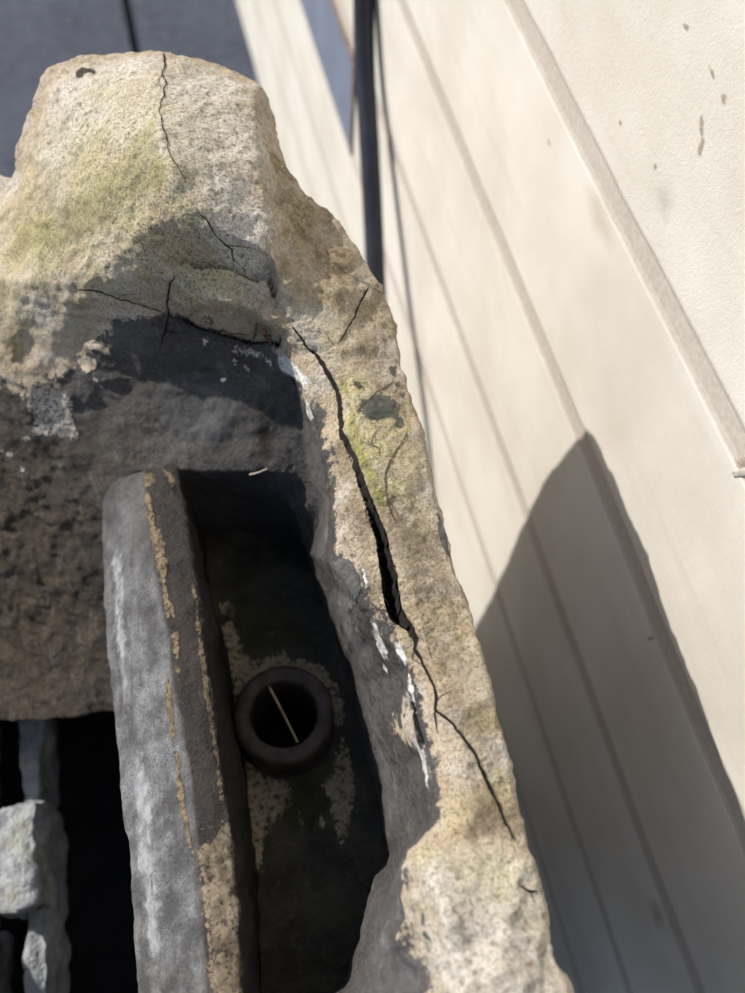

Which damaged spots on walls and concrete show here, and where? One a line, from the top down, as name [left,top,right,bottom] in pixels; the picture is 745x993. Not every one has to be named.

crack [157,52,186,181]
crack [196,209,253,273]
crack [72,275,179,351]
peeling [74,343,111,388]
peeling [231,345,272,372]
peeling [22,385,79,442]
crack [291,268,518,843]